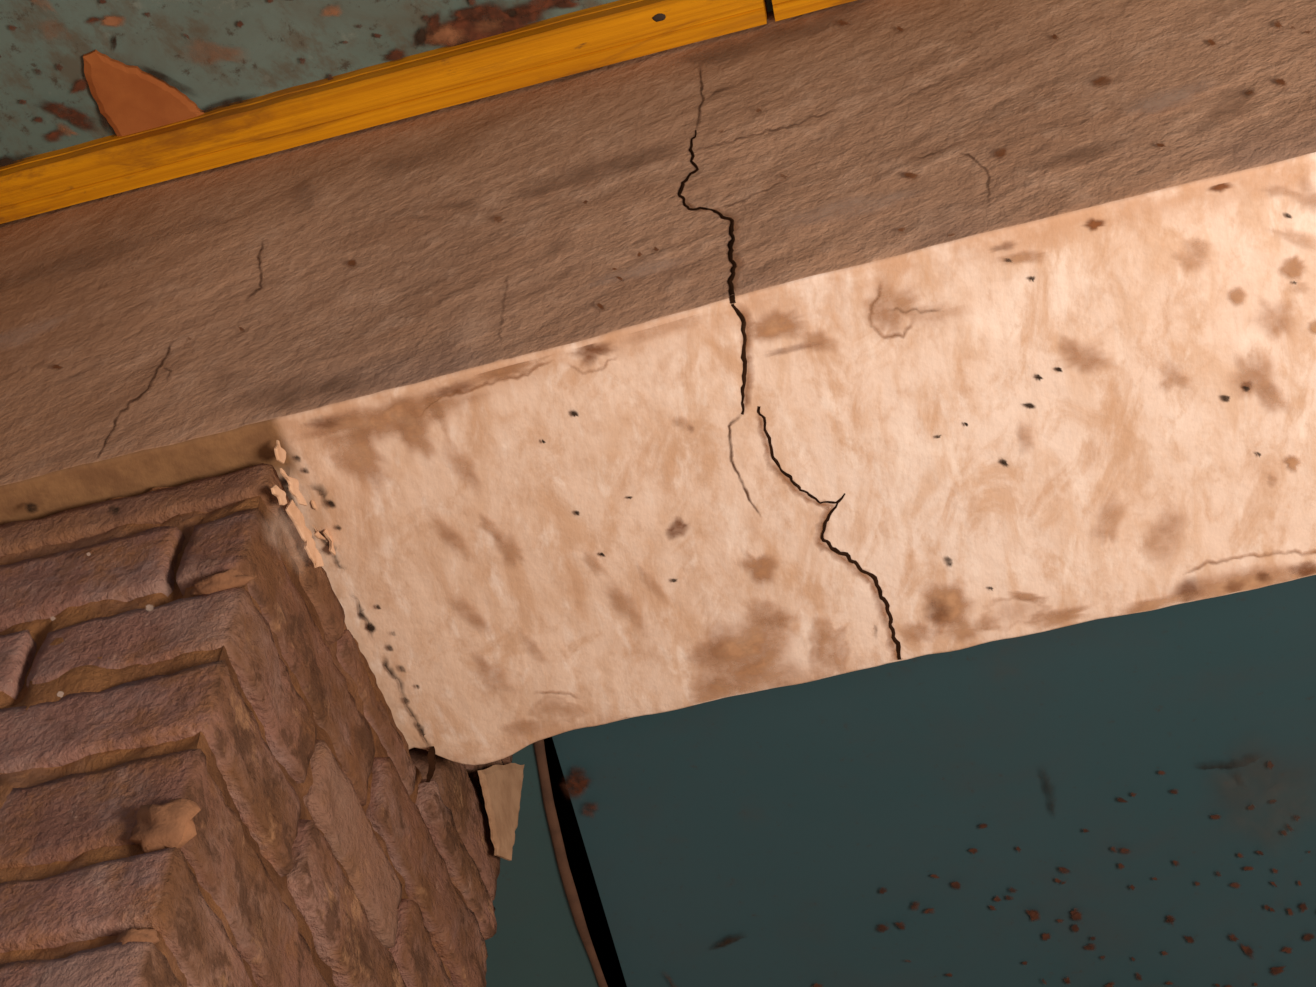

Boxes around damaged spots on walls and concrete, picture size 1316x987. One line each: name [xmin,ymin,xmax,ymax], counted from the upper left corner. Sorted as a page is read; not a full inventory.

rust [386,0,578,61]
crack [678,70,901,660]
flaking render [271,440,341,568]
flaking render [359,604,381,632]
flaking render [384,645,436,782]
rust [1027,909,1105,960]